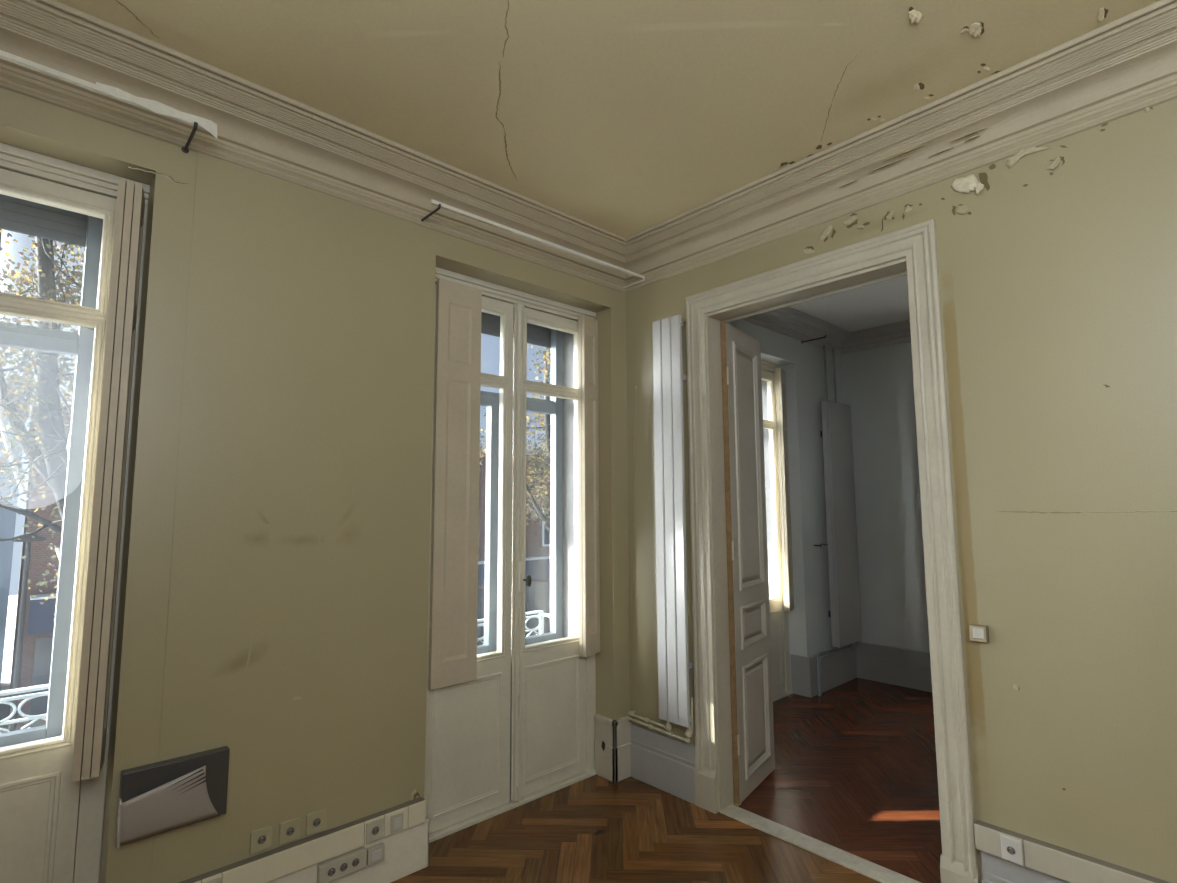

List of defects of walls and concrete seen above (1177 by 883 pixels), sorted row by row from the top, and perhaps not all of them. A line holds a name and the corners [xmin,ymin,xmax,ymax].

peeling [908,7,923,24]
crack [495,0,517,180]
peeling [840,128,987,188]